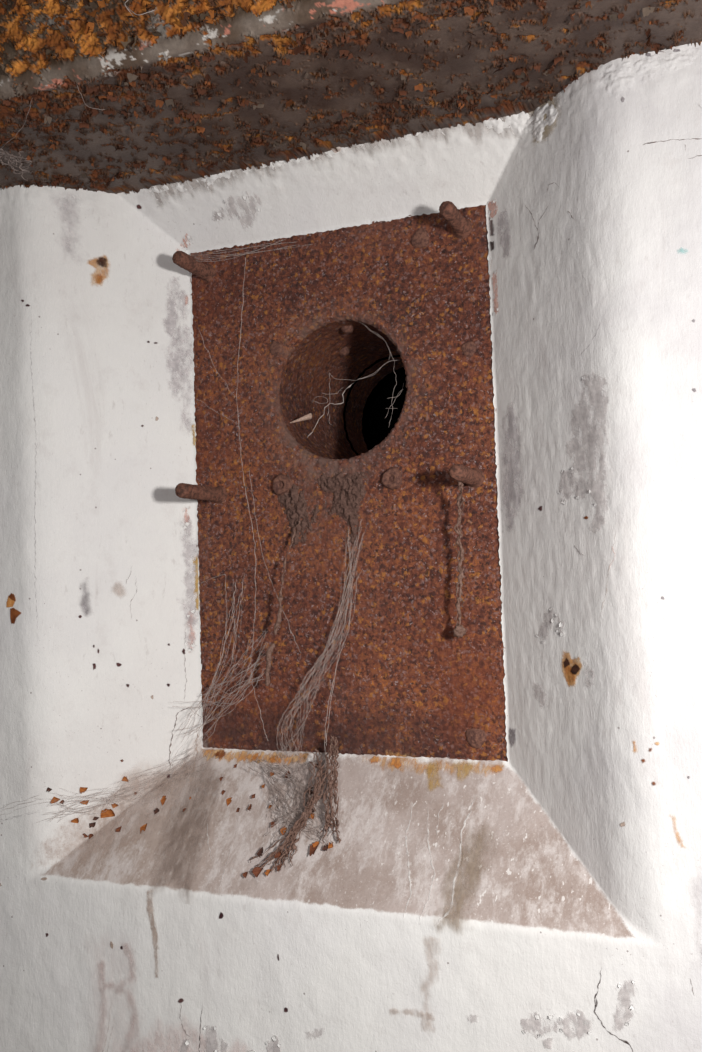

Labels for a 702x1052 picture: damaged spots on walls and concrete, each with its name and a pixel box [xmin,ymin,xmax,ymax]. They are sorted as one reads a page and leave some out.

corrosion [0,0,591,189]
corrosion [89,256,108,284]
corrosion [562,653,582,687]
corrosion [203,749,308,764]
corrosion [371,753,502,789]
water stain [147,892,157,958]
crack [594,971,633,1051]